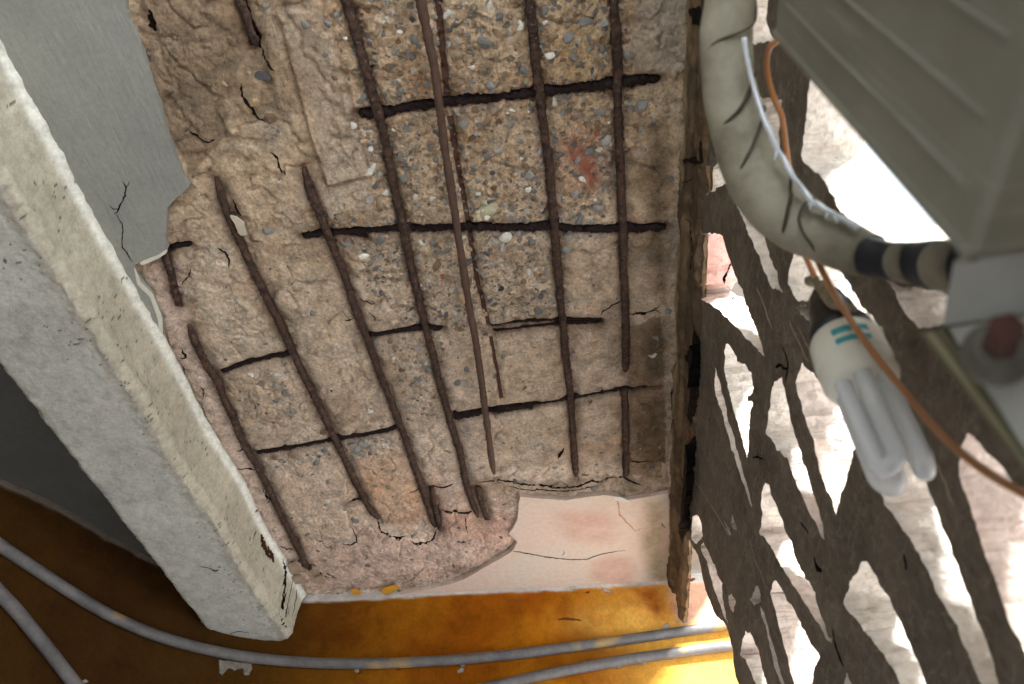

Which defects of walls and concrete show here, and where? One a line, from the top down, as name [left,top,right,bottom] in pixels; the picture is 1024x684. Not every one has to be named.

rust [434,0,451,95]
crack [109,182,132,261]
spalling [128,0,697,595]
rust [447,115,503,399]
crack [479,461,665,560]